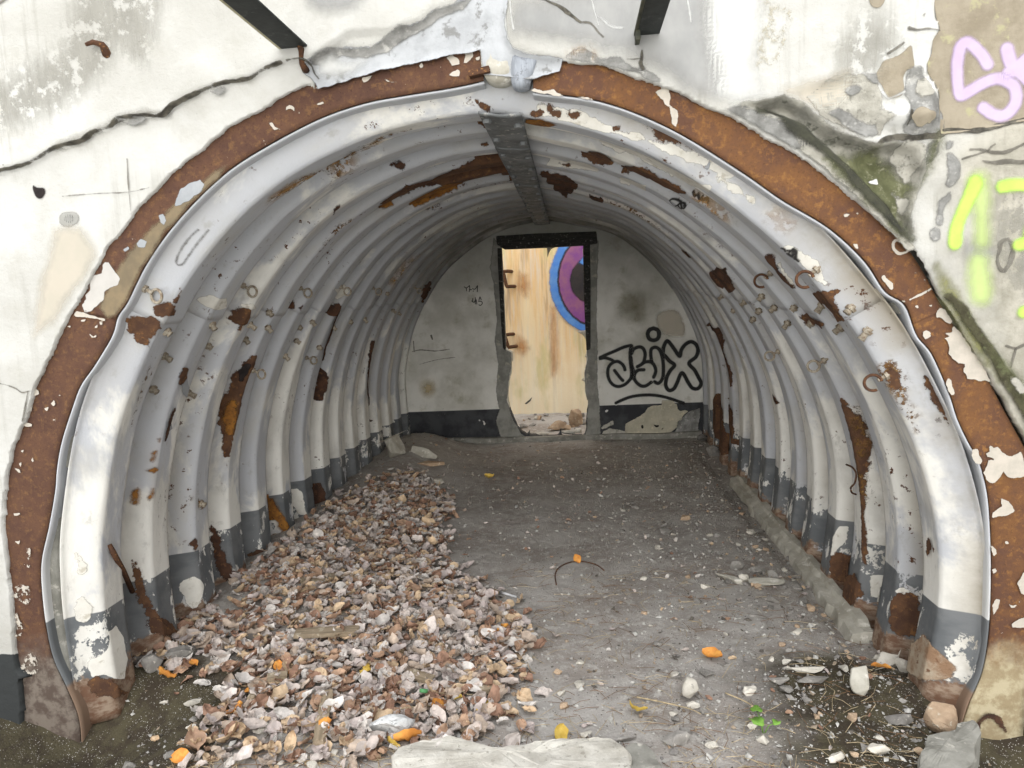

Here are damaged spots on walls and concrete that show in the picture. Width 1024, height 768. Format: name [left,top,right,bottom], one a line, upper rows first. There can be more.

crack [0,57,319,172]
rust [379,142,512,210]
peeling [537,97,756,204]
rust [581,151,724,216]
spalling [728,0,1024,250]
peeling [68,170,227,338]
rust [125,288,182,346]
rust [799,289,851,329]
rust [217,355,257,458]
rust [829,398,873,606]
peeling [992,499,1014,518]
peeling [87,626,128,679]